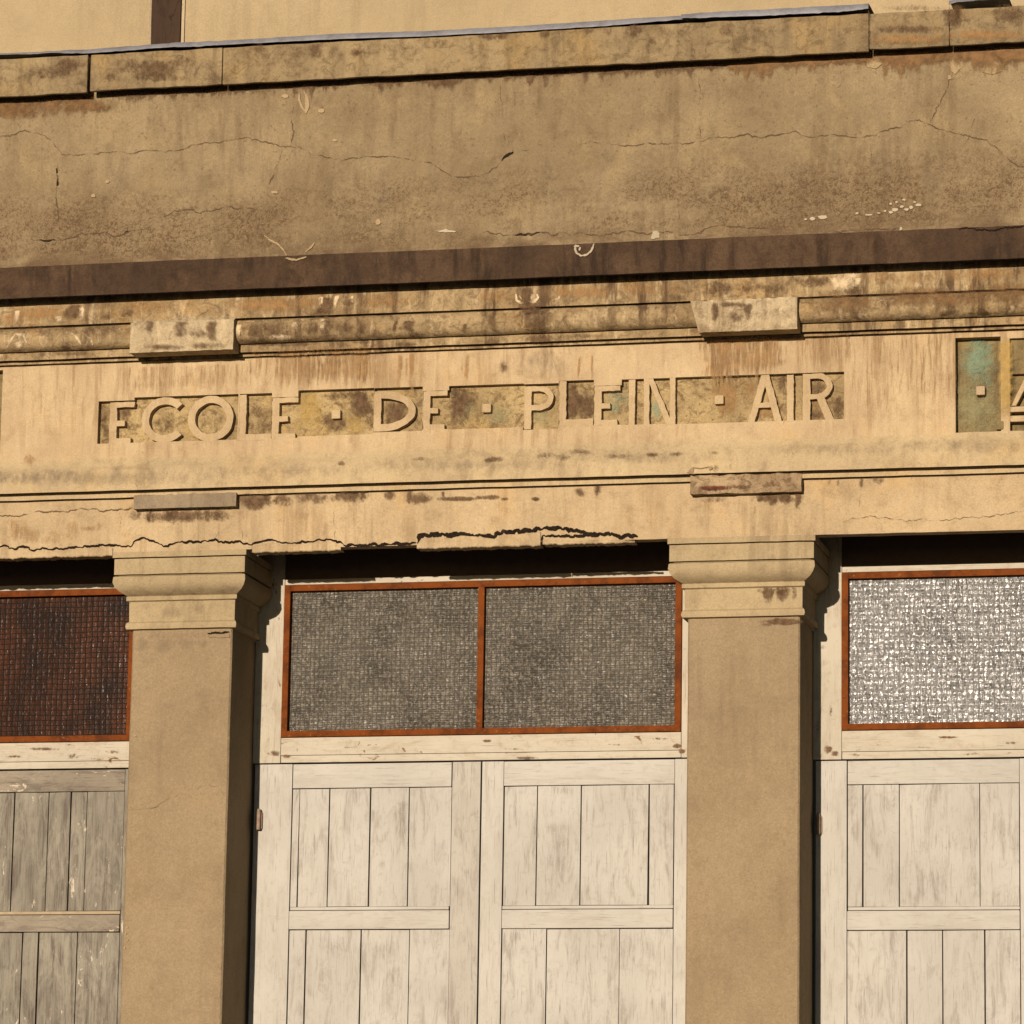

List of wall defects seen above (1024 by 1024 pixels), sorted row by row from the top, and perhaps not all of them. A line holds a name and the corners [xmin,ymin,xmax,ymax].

crack [588,79,1024,168]
crack [3,107,527,242]
flaking render [855,199,921,216]
crack [487,225,764,236]
damp [135,509,222,521]
crack [0,520,638,552]
flaking render [417,532,638,552]